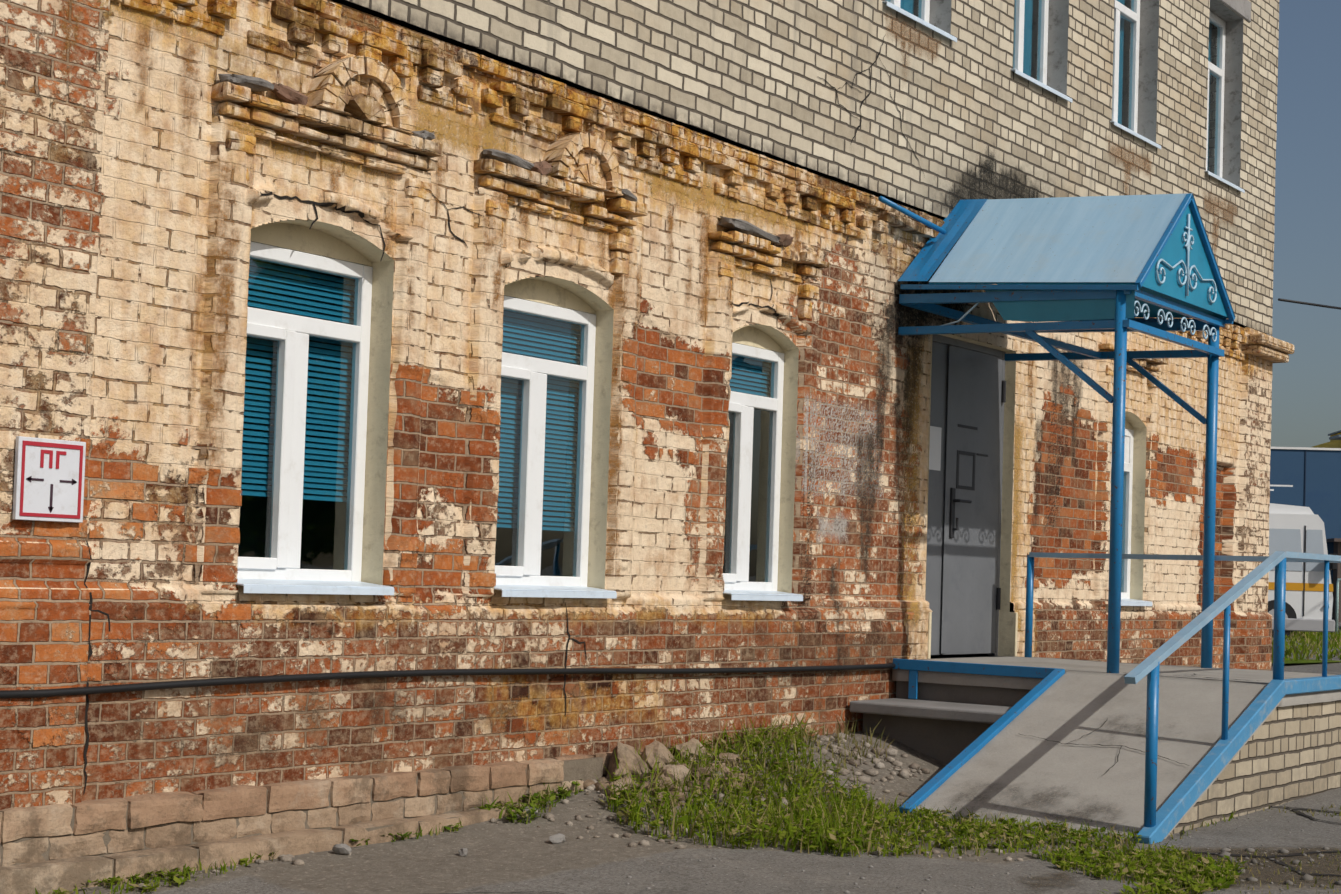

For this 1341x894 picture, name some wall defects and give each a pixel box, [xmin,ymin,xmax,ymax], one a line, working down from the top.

peeling [0,302,29,328]
peeling [0,0,129,271]
peeling [52,319,88,360]
peeling [0,415,262,753]
spalling [292,607,341,634]
crack [260,192,385,262]
peeling [377,363,501,628]
spalling [504,674,620,744]
peeling [612,282,731,590]
peeling [1025,384,1110,592]
crack [1020,720,1189,776]
peeling [1145,434,1234,628]